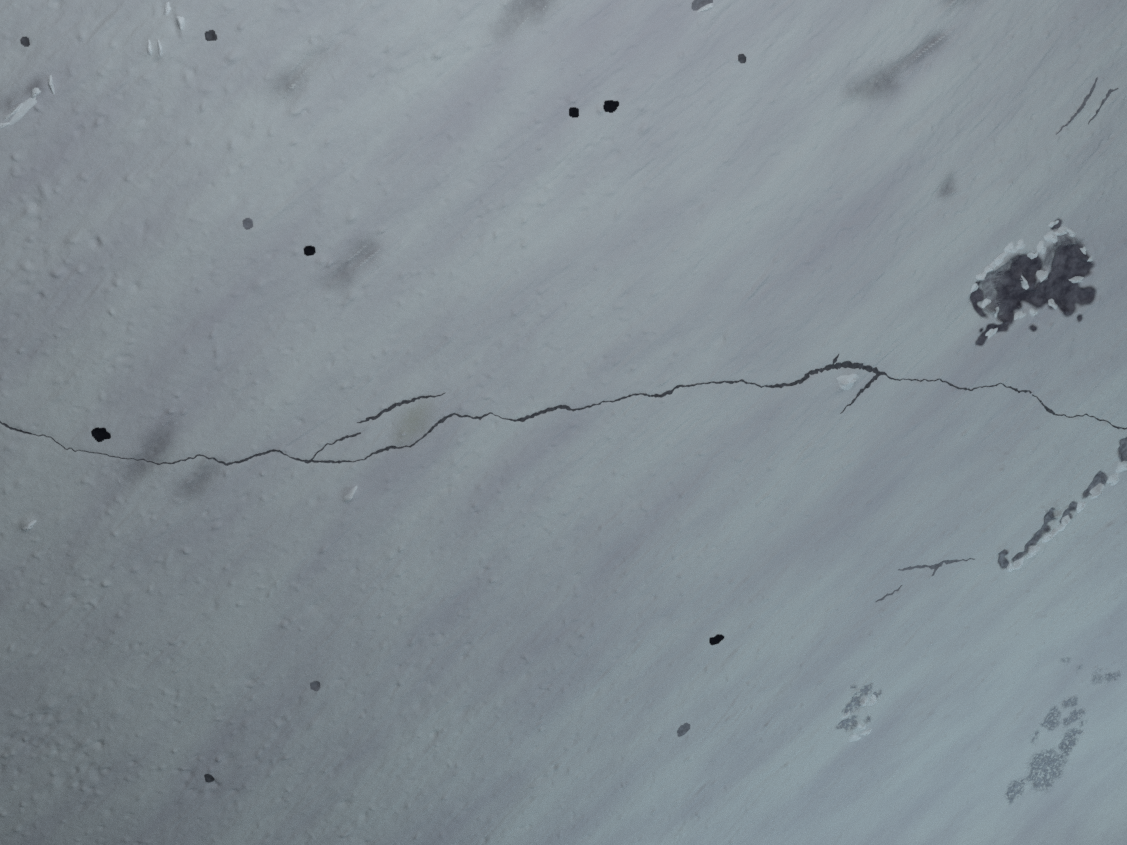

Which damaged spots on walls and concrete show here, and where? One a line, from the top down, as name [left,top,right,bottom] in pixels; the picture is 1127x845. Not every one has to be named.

peeling [970,219,1096,345]
crack [0,354,1127,466]
peeling [998,437,1127,572]